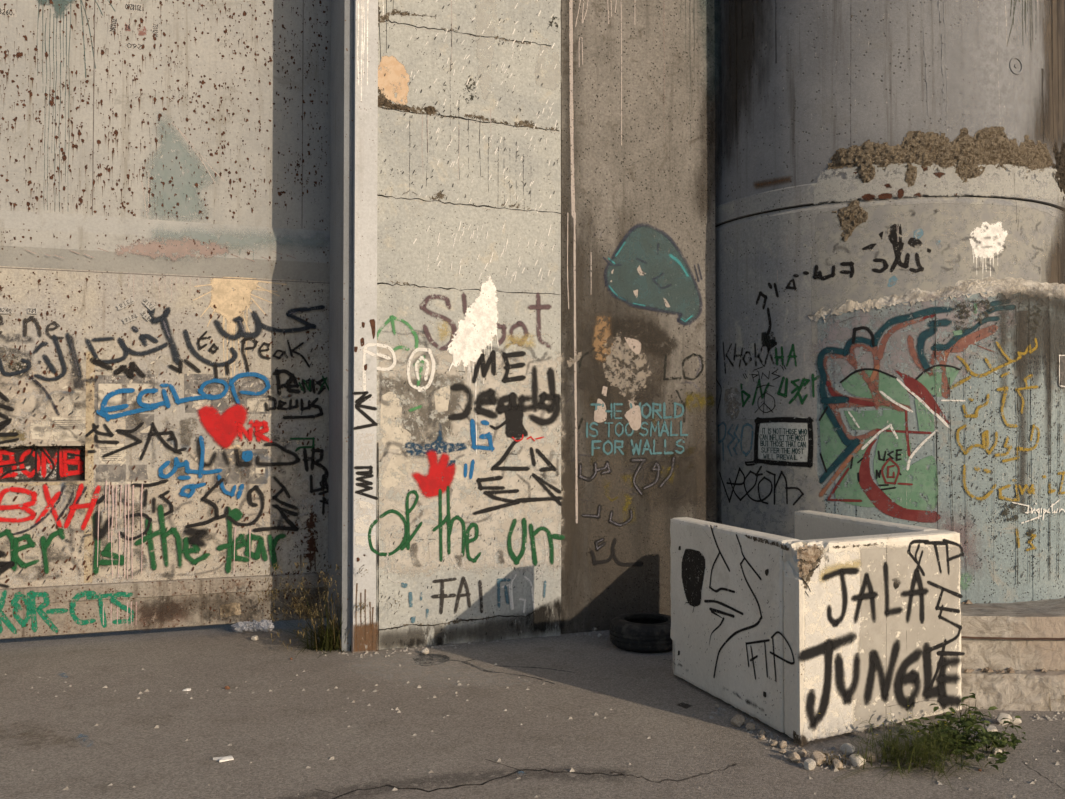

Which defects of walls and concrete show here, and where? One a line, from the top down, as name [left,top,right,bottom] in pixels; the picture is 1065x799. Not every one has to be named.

corrosion [0,0,328,222]
leakage [699,0,764,212]
spalling [828,126,1065,201]
spalling [832,200,868,242]
spalling [952,299,995,333]
spalling [999,502,1019,522]
spalling [745,535,887,597]
spalling [793,730,808,747]